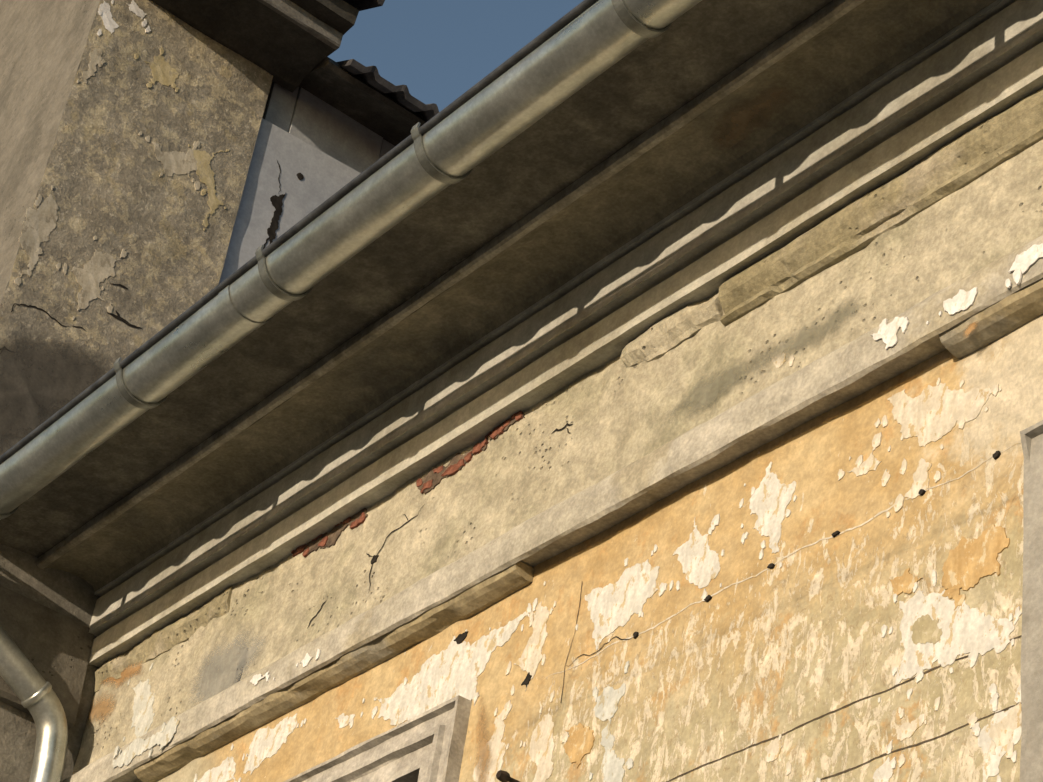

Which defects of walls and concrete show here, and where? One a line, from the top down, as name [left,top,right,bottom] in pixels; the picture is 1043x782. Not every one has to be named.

crack [11,303,85,330]
crack [107,283,142,329]
damp [0,340,105,451]
flaking render [416,410,525,495]
peeling [838,378,1002,518]
flaking render [291,508,368,557]
crack [366,504,425,588]
peeling [585,514,724,650]
peeling [738,462,797,568]
peeling [335,598,569,782]
peeling [873,570,1022,782]
peeling [193,713,307,782]